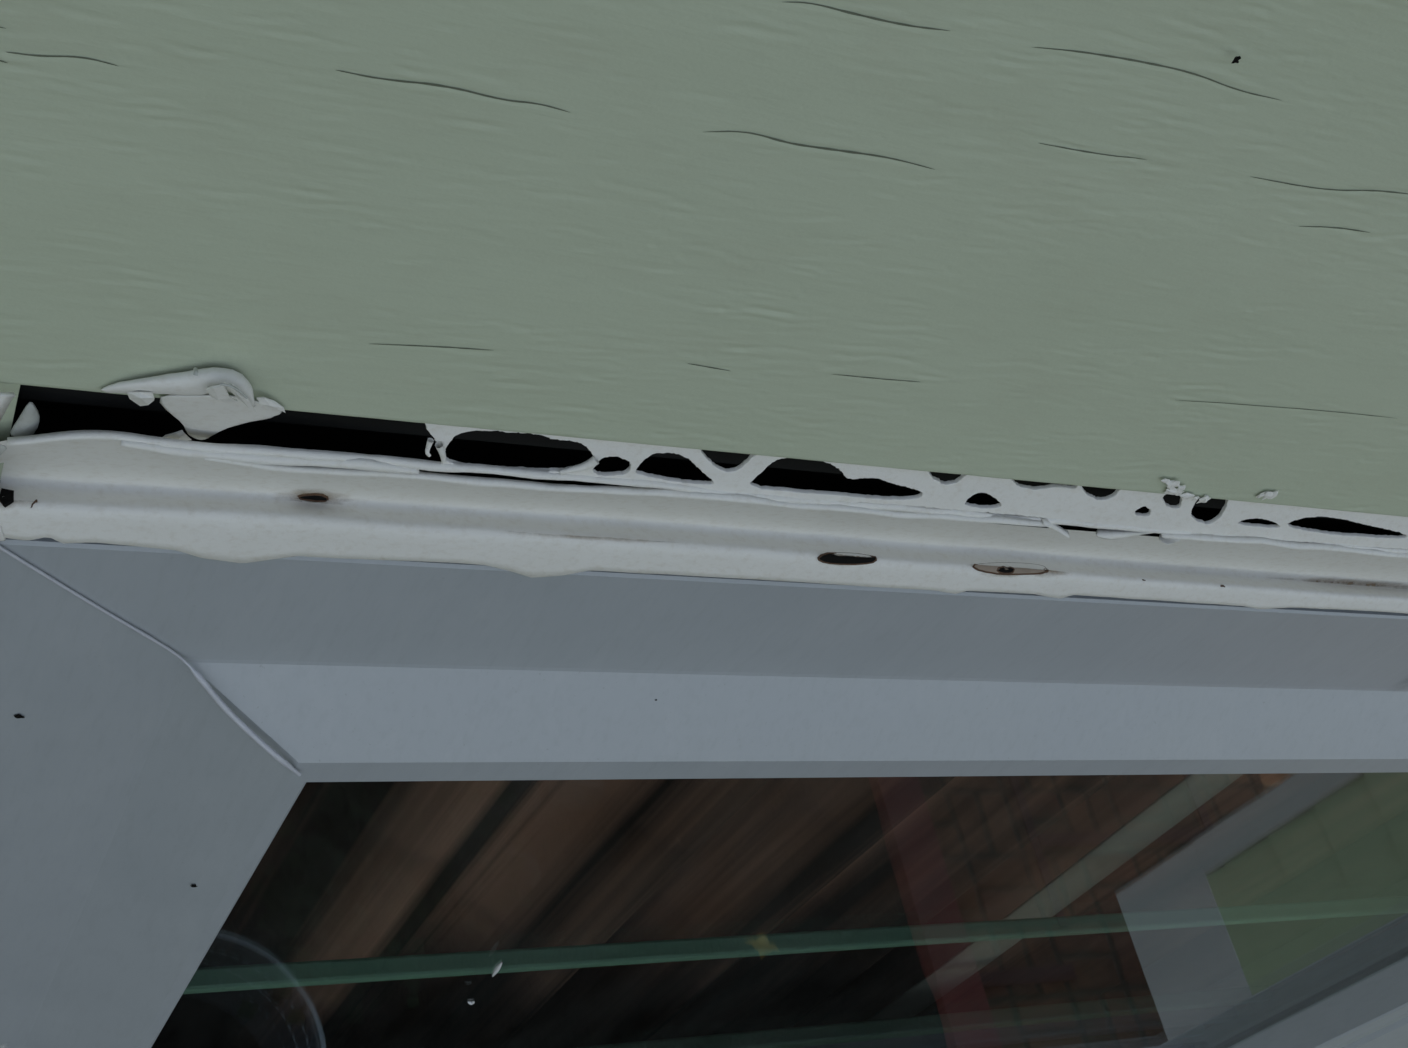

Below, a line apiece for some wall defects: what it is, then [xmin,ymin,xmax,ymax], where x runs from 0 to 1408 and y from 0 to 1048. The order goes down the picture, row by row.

peeling [127,391,155,406]
peeling [206,382,285,413]
peeling [0,392,40,437]
peeling [163,430,191,441]
peeling [1161,478,1211,504]
peeling [1096,529,1181,545]